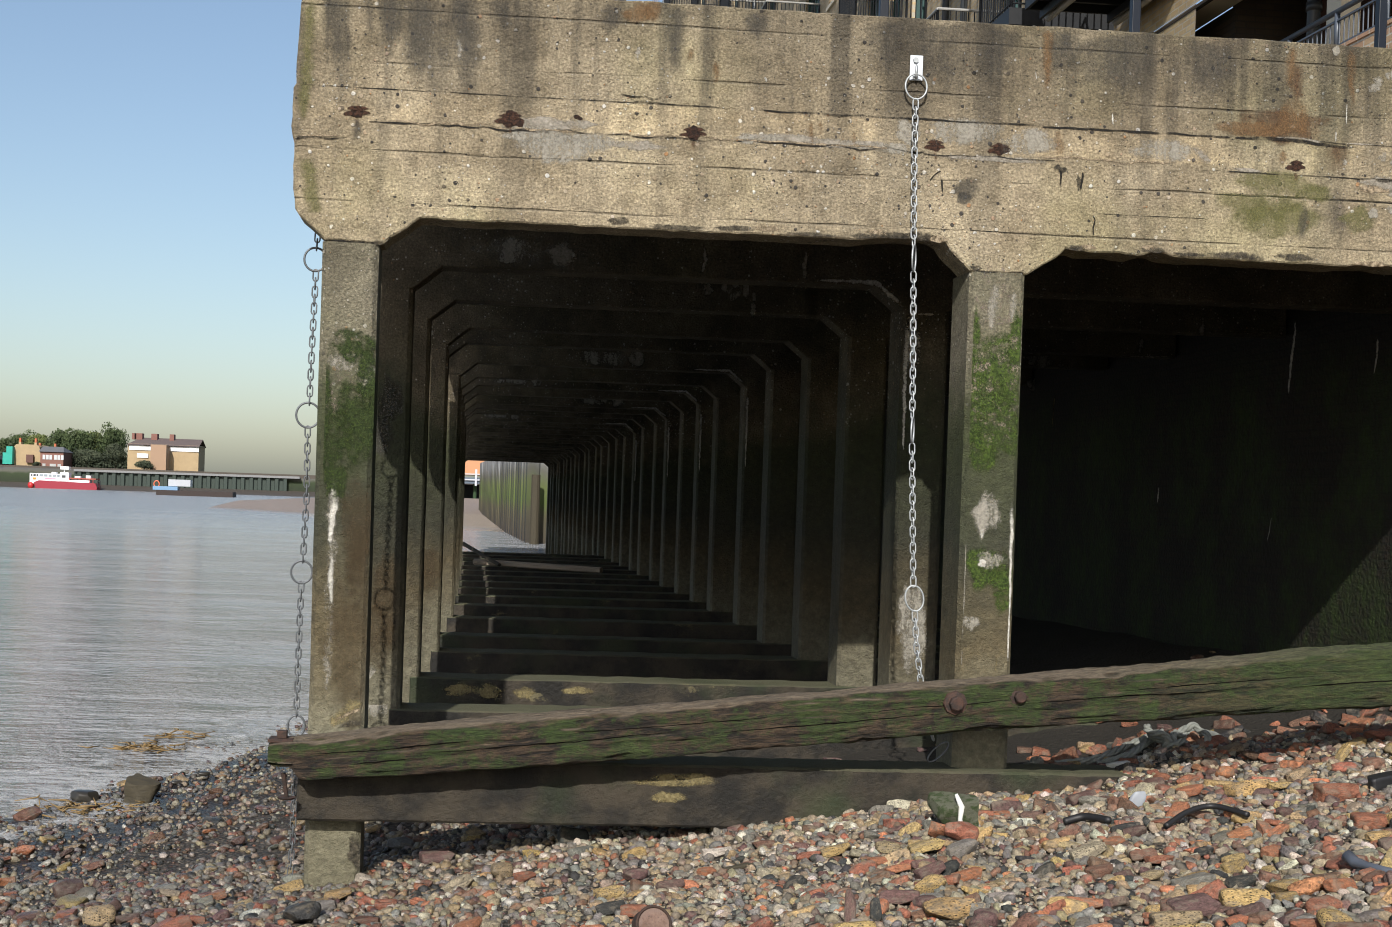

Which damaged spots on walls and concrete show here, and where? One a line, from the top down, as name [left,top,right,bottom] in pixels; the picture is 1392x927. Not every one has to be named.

rust [343,106,370,116]
rust [494,113,524,127]
rust [924,139,945,157]
rust [987,143,1011,153]
rust [1286,160,1305,176]
damp [962,494,1014,665]